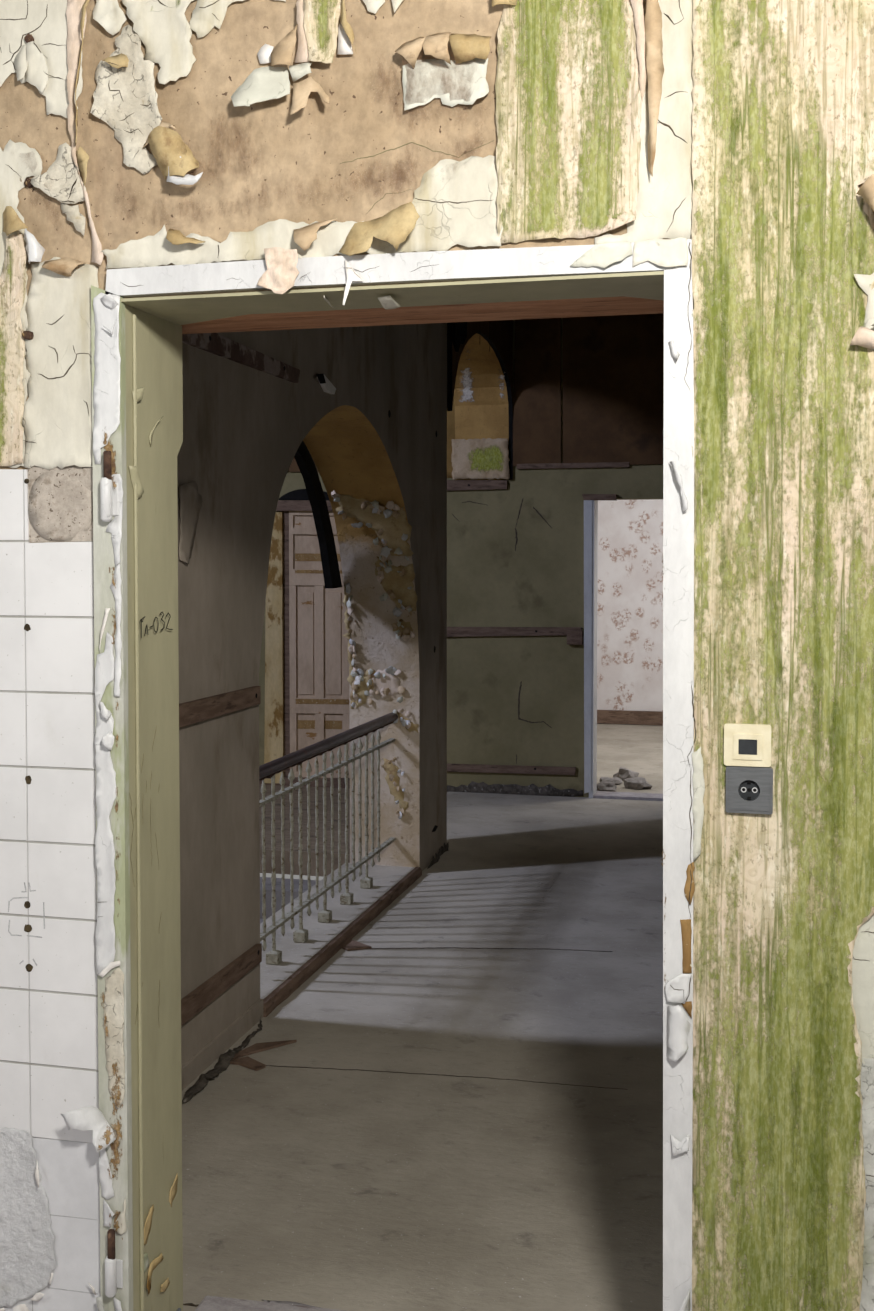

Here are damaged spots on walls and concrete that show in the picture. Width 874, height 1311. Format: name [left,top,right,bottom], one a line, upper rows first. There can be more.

crack [0,1,64,80]
peeling [0,0,245,185]
peeling [231,24,329,115]
peeling [395,32,491,111]
peeling [570,0,694,268]
crack [40,316,92,415]
peeling [0,140,503,470]
leakage [718,326,727,435]
leakage [814,421,823,576]
peeling [61,474,126,1235]
leakage [813,630,840,895]
leakage [792,958,838,1308]